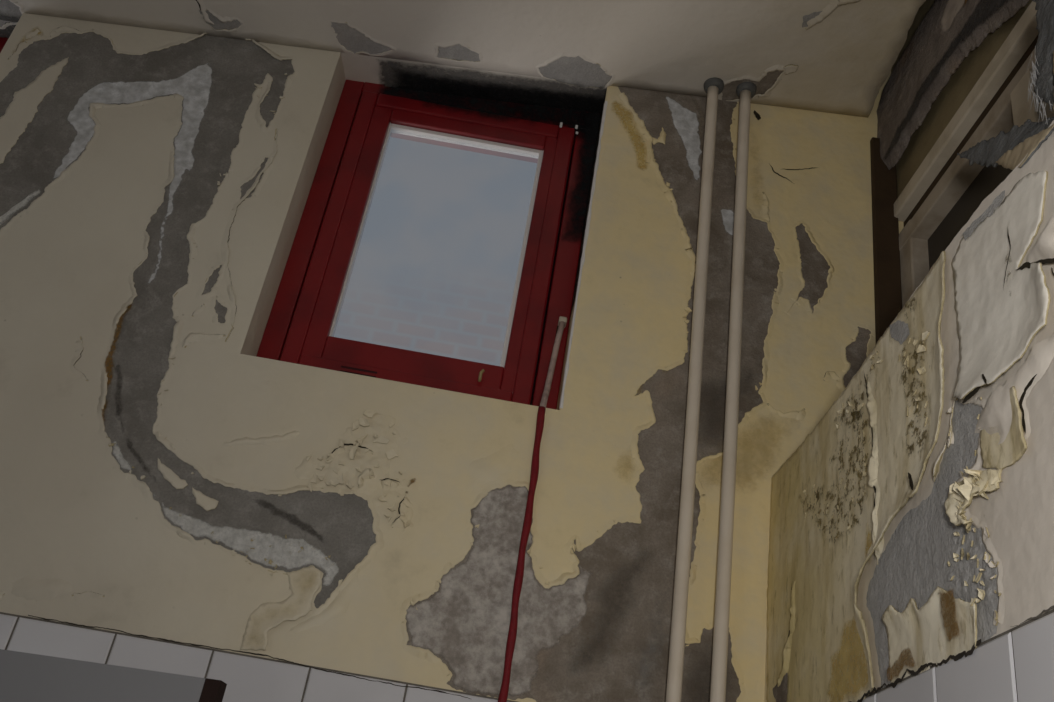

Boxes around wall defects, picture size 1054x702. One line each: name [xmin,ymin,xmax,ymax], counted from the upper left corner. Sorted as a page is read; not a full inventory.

peeling [0,0,25,29]
peeling [328,20,396,56]
peeling [434,40,483,64]
peeling [535,53,616,90]
spalling [718,64,786,120]
peeling [784,219,834,319]
flaking render [0,8,384,614]
damp [399,87,784,702]
peeling [766,251,1054,702]
crack [1010,605,1054,627]